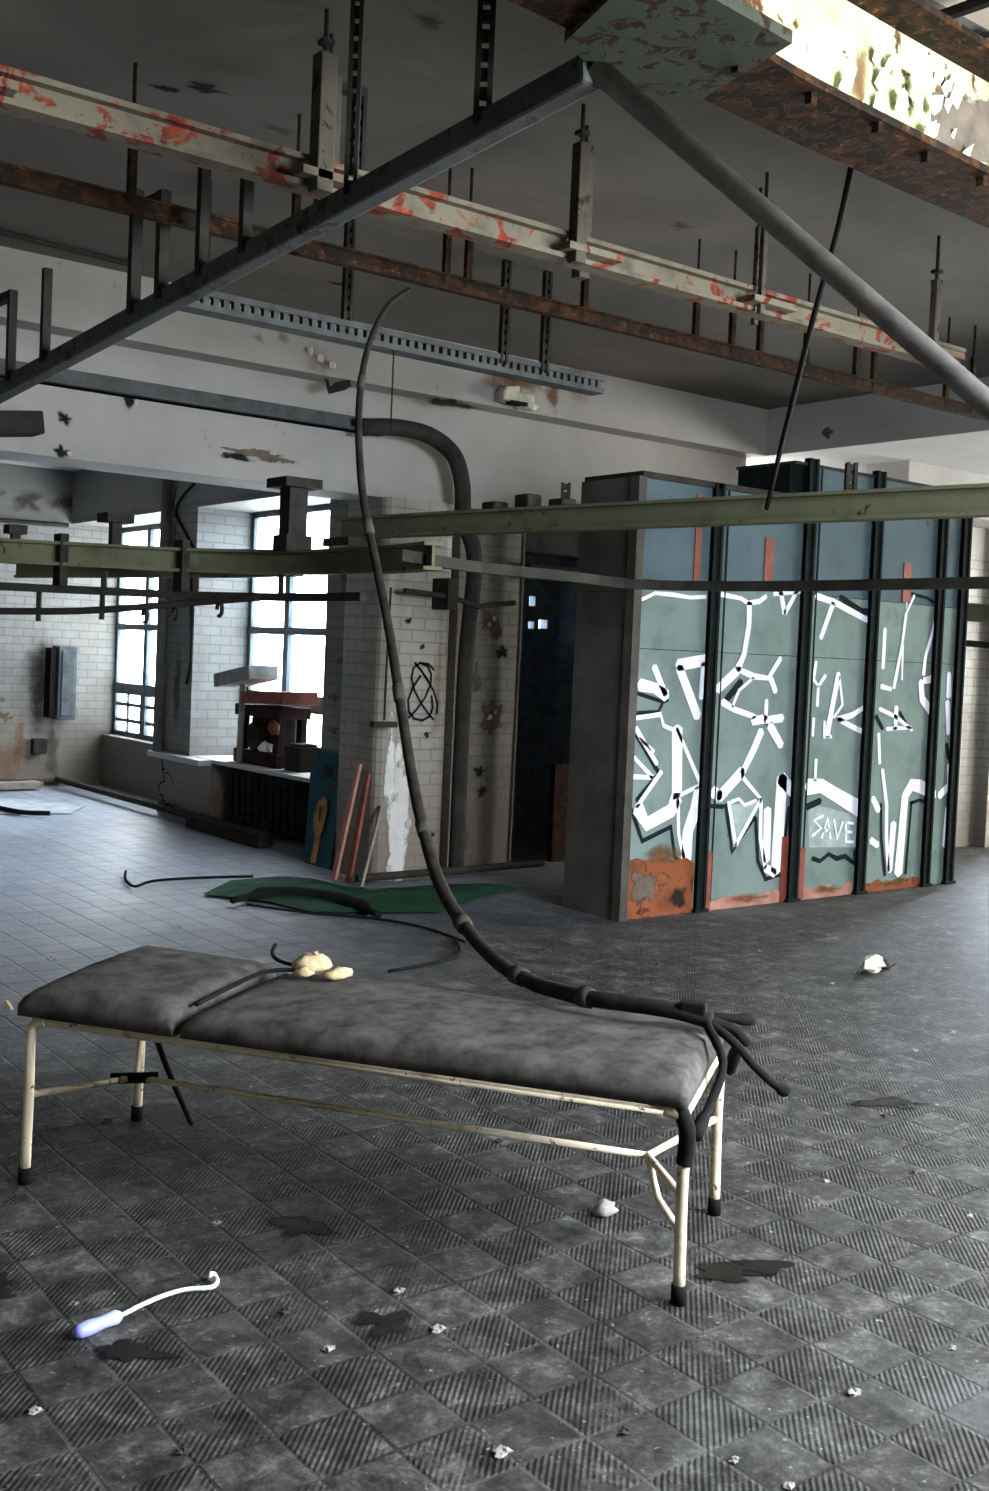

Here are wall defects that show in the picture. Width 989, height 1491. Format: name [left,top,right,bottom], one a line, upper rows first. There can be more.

peeling [838,45,989,163]
rust [627,846,694,920]
rust [710,890,780,910]
rust [803,877,920,900]